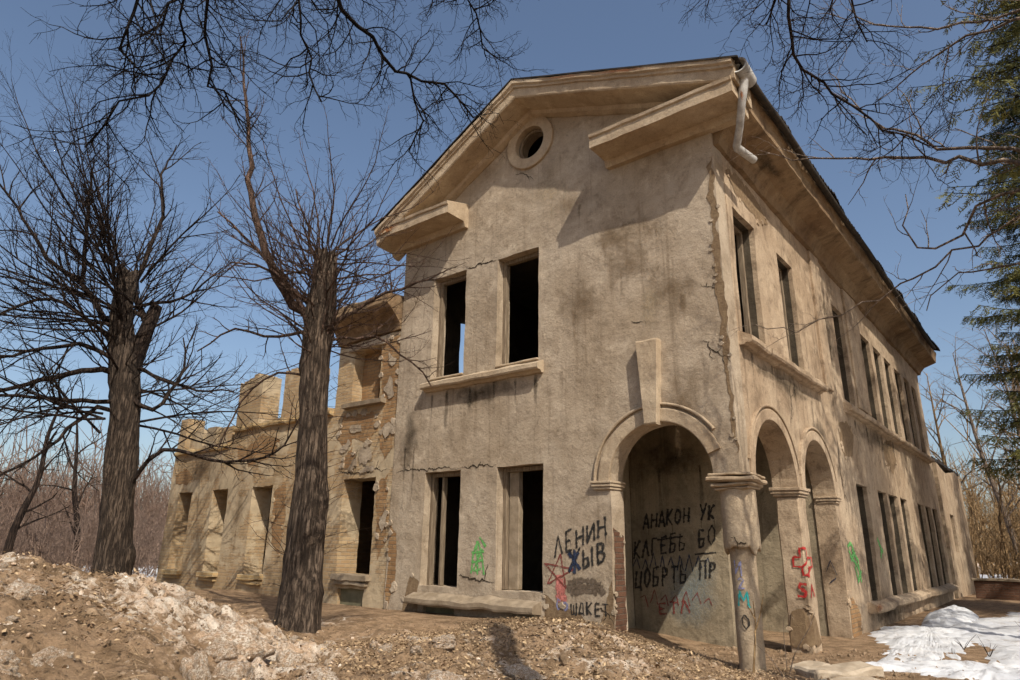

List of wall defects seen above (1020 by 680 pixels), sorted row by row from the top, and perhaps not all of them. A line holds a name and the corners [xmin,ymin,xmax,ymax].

flaking render [706,155,768,453]
flaking render [336,334,401,472]
flaking render [373,475,419,612]